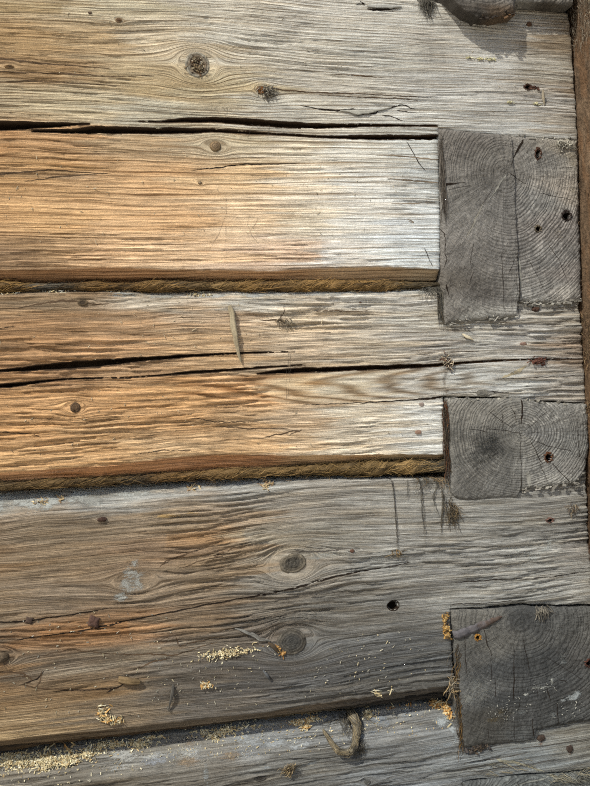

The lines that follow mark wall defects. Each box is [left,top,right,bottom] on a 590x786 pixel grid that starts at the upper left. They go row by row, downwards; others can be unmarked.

crack [0,58,152,86]
crack [0,74,465,223]
crack [466,139,526,280]
crack [501,254,546,312]
crack [0,351,583,487]
crack [0,559,419,692]
crack [464,630,590,783]